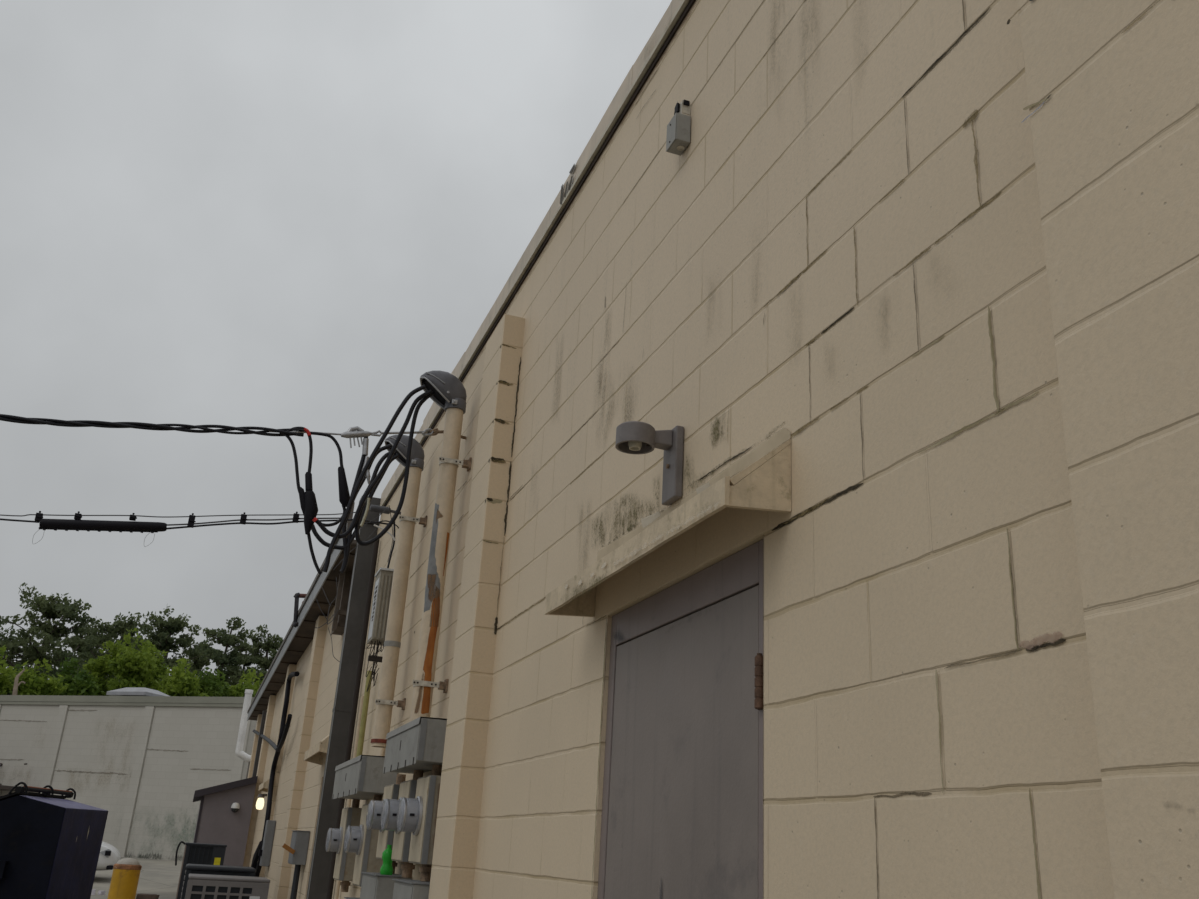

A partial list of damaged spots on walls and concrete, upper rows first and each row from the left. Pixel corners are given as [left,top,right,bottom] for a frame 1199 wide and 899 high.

crack [879,0,990,202]
crack [1021,95,1051,123]
crack [763,150,858,384]
crack [894,110,1002,357]
crack [494,357,546,635]
crack [772,386,868,531]
crack [918,306,1039,453]
crack [873,527,1022,899]
crack [1029,789,1041,899]